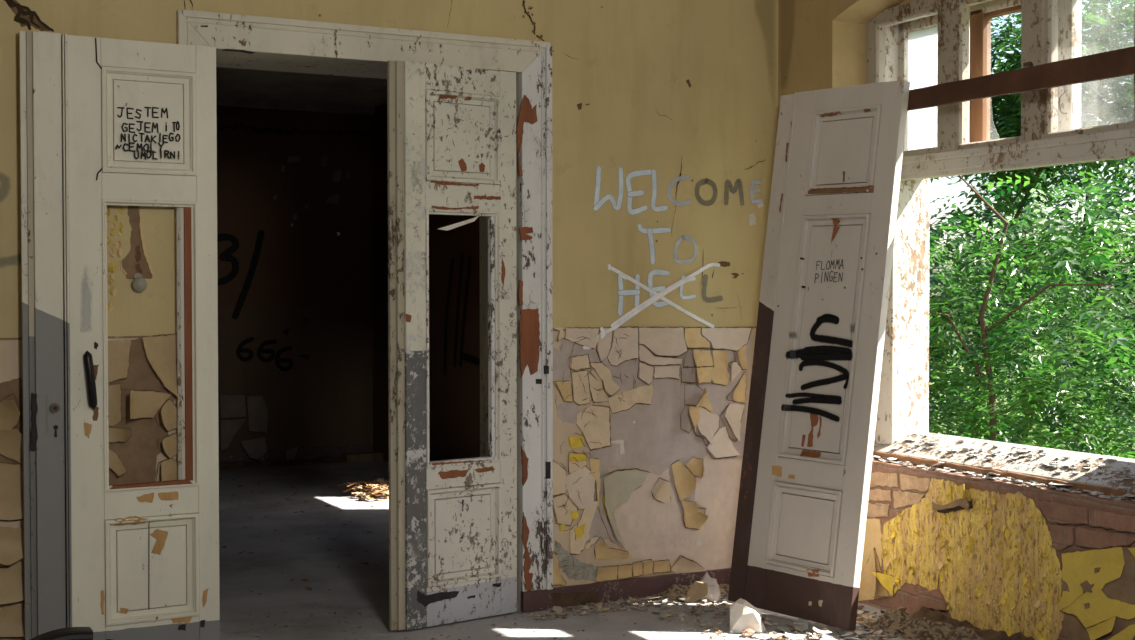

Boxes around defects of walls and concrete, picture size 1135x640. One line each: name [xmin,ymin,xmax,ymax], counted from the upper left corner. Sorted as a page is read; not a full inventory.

crack [4,0,54,32]
crack [514,0,576,59]
peeling [0,377,25,638]
peeling [103,334,178,485]
flaking render [518,280,753,603]
peeling [858,457,1135,640]